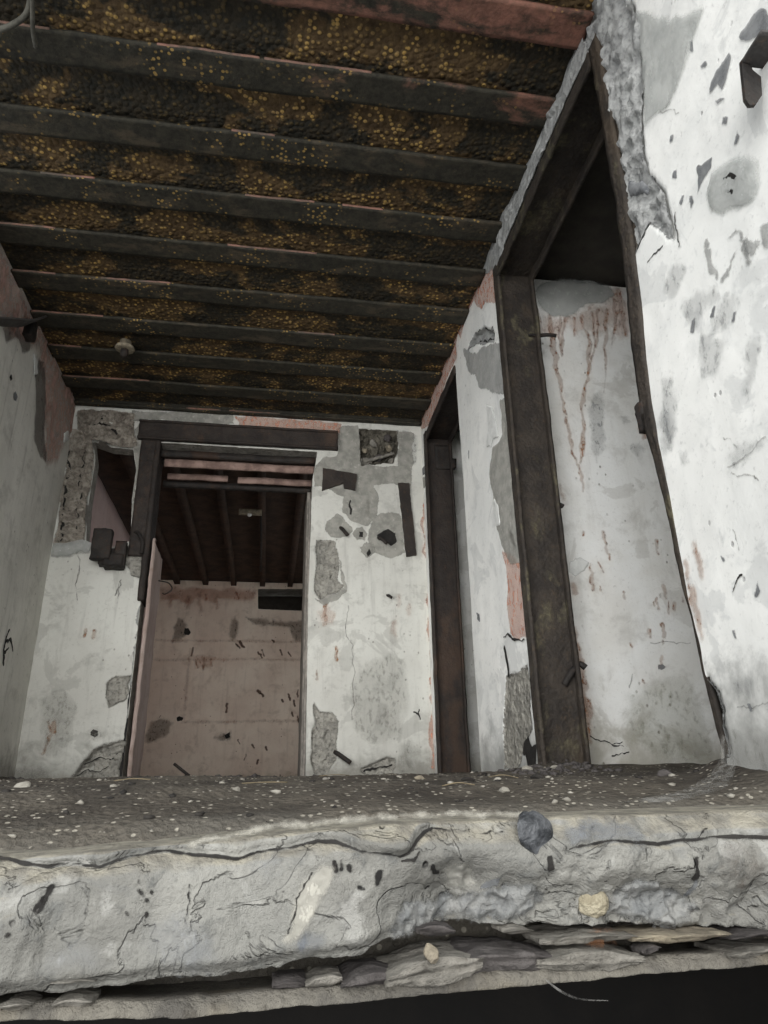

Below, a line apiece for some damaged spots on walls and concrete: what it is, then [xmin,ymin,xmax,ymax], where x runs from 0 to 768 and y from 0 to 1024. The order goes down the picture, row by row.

spalling [468,0,712,308]
leakage [33,353,46,461]
corrosion [540,291,626,474]
spalling [53,409,137,543]
flaking render [235,325,536,775]
spalling [105,606,140,708]
spalling [72,729,126,778]
crack [0,827,503,869]
crack [572,828,768,849]